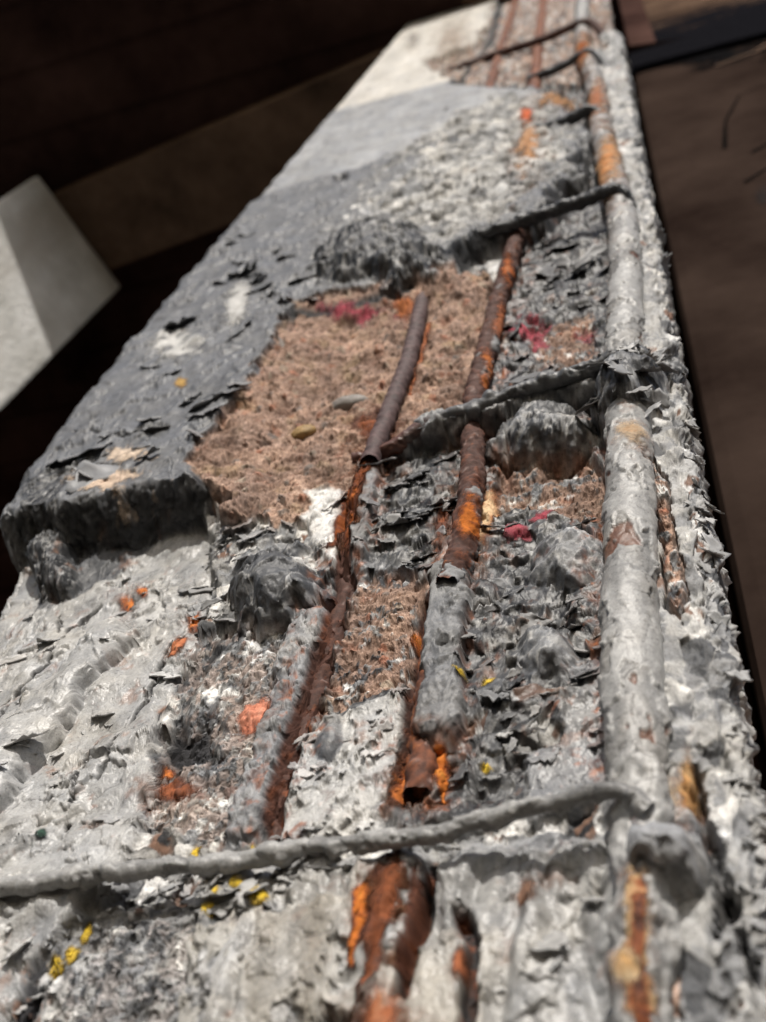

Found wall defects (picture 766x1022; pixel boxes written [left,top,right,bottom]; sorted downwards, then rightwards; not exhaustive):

flaking render [346,0,583,244]
peeling [500,225,609,384]
peeling [0,216,493,856]
corrosion [327,407,380,550]
corrosion [435,476,500,540]
peeling [589,0,766,1001]
peeling [426,451,607,809]
corrosion [239,698,270,736]
corrosion [390,743,452,808]
corrosion [347,860,430,1022]
corrosion [452,946,471,982]
corrosion [614,867,656,1022]